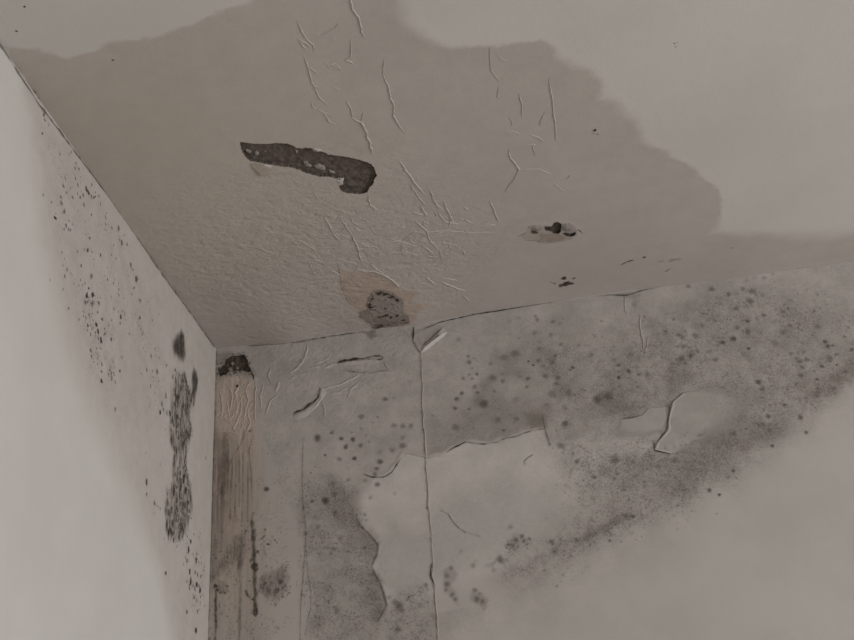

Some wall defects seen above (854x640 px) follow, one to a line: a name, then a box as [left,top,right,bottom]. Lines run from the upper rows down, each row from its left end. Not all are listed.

damp [0,47,216,640]
spalling [217,354,254,379]
spalling [240,142,376,192]
crack [298,0,373,154]
peeling [333,261,441,339]
damp [0,0,854,349]
crack [299,55,665,638]
damp [215,261,854,640]
peeling [345,390,737,617]
peeling [513,220,583,244]